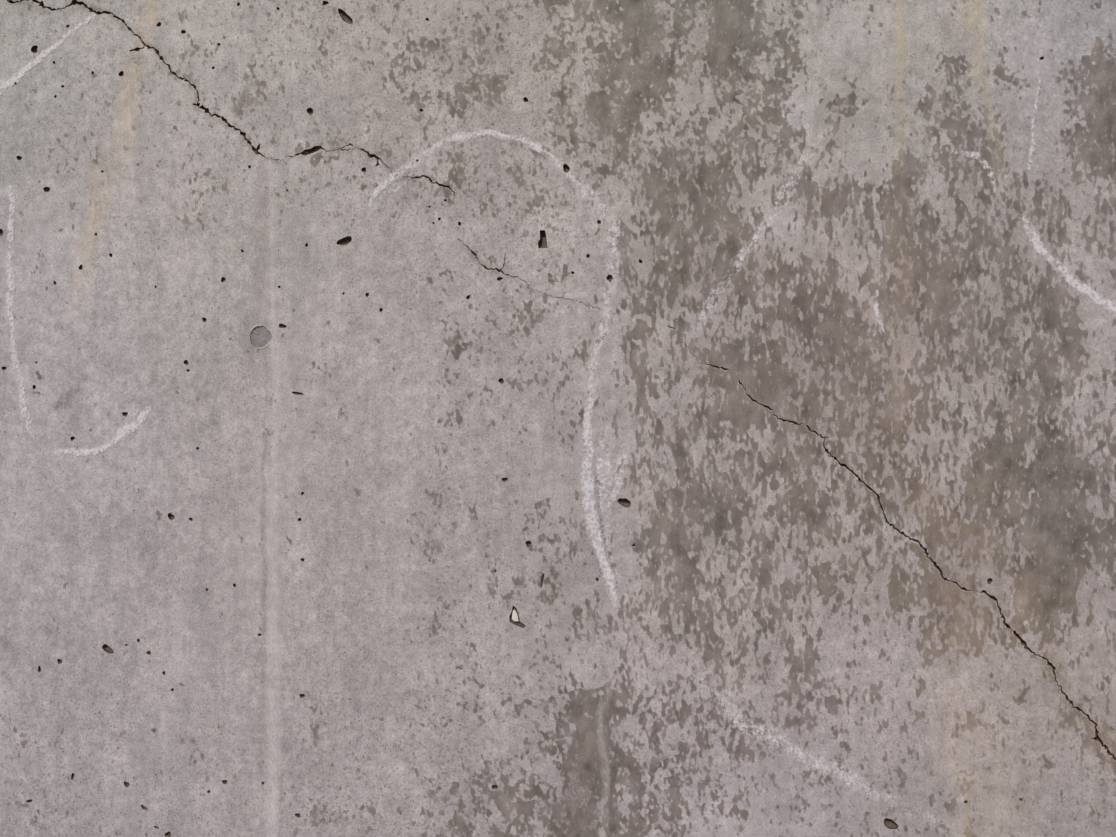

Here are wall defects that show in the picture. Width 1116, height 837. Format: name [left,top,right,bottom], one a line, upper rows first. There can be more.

crack [7,0,455,196]
crack [460,240,604,311]
crack [667,325,1116,760]